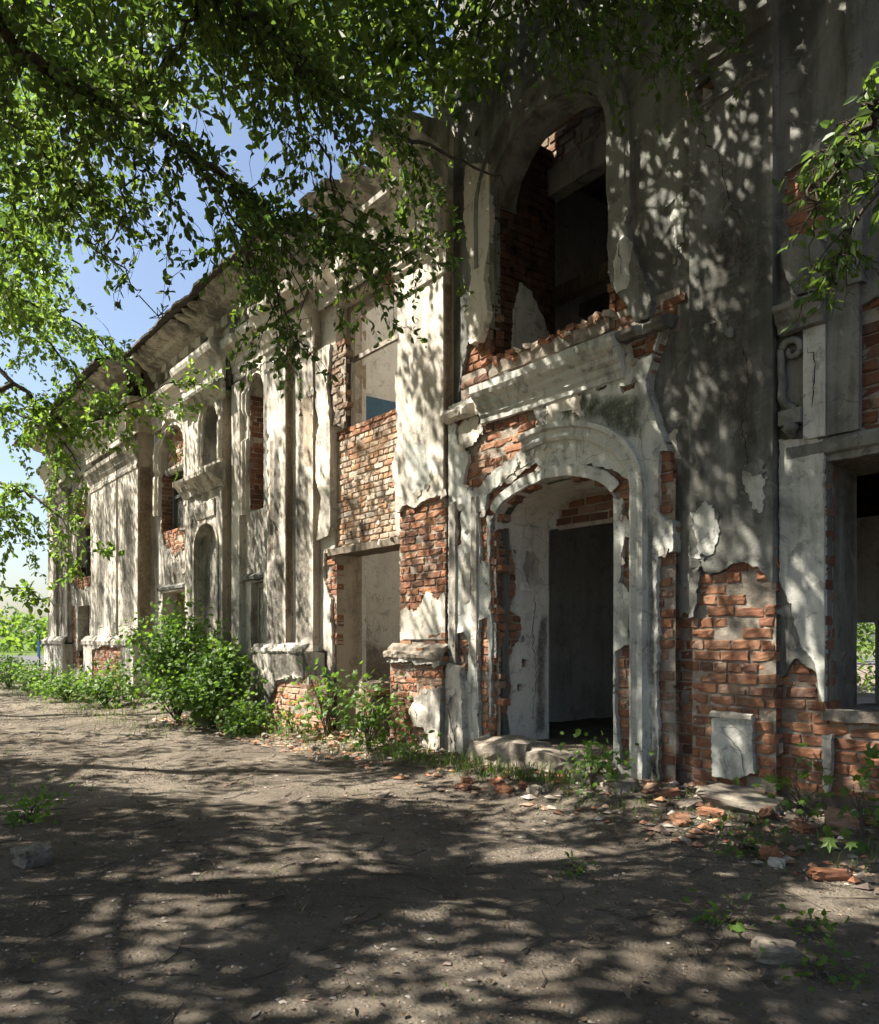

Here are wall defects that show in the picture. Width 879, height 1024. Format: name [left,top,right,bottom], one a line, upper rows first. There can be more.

spalling [613,290,627,312]
spalling [460,314,510,375]
spalling [623,335,665,392]
crack [807,348,816,403]
spalling [389,392,585,745]
spalling [643,424,879,819]
spalling [616,645,630,769]